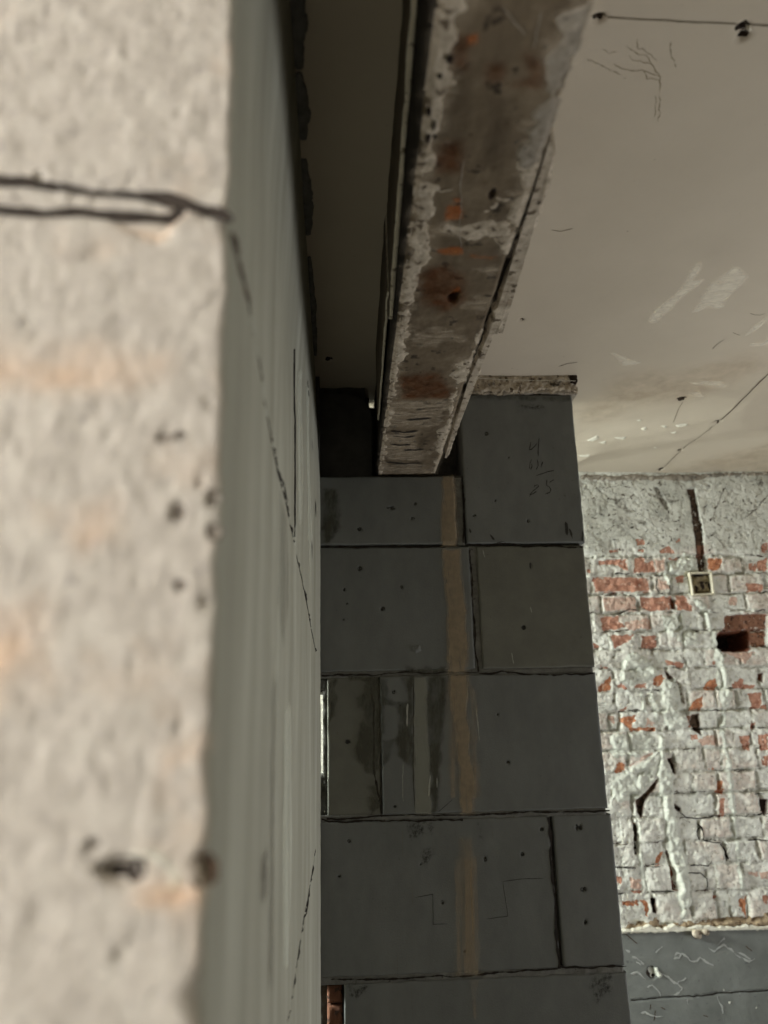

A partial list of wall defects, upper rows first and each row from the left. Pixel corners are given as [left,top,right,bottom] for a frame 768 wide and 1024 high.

peeling [378,0,594,475]
flaking render [581,472,768,486]
spalling [587,538,692,649]
spalling [712,543,768,665]
leakage [329,676,382,773]
spalling [607,706,655,732]
spalling [597,660,684,695]
spalling [686,678,717,746]
spalling [739,723,768,766]
spalling [632,780,657,854]
crack [652,813,768,892]
spalling [616,876,656,916]